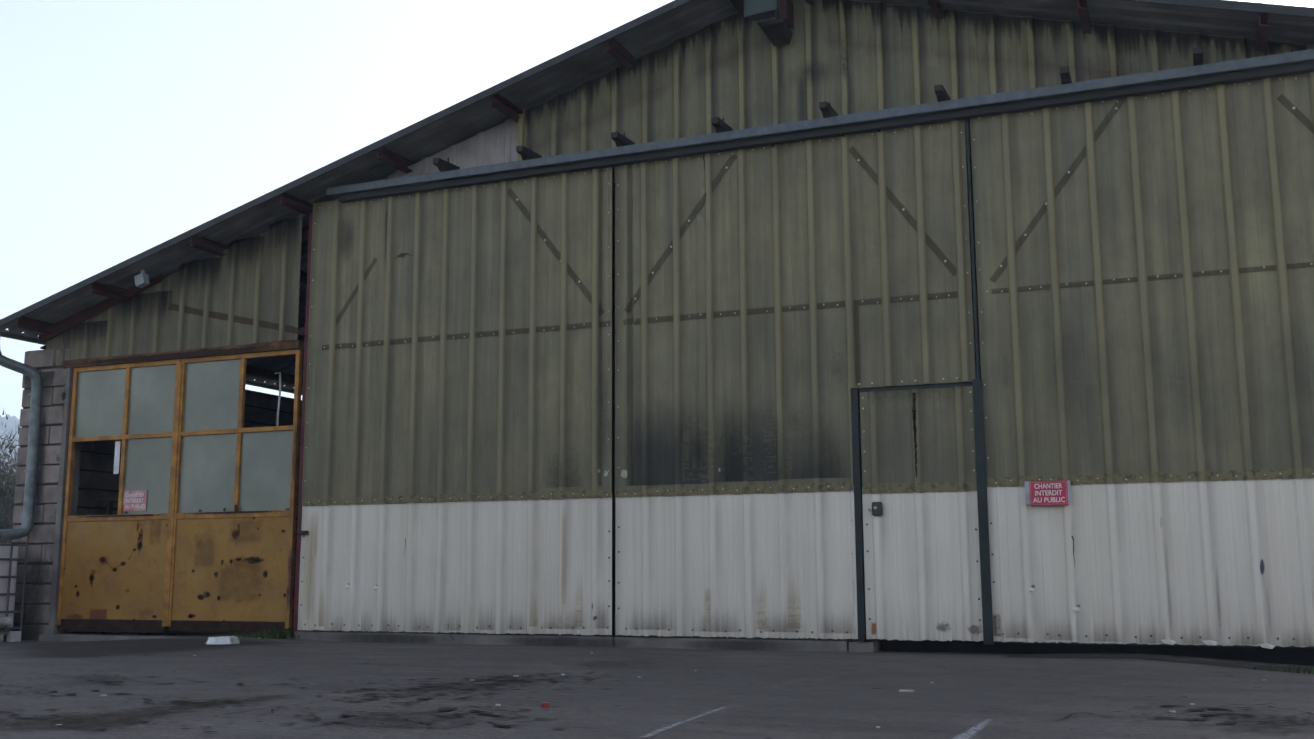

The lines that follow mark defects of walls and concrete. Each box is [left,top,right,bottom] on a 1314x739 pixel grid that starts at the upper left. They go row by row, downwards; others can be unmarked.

corrosion [195,505,290,539]
corrosion [75,511,168,597]
corrosion [214,557,268,578]